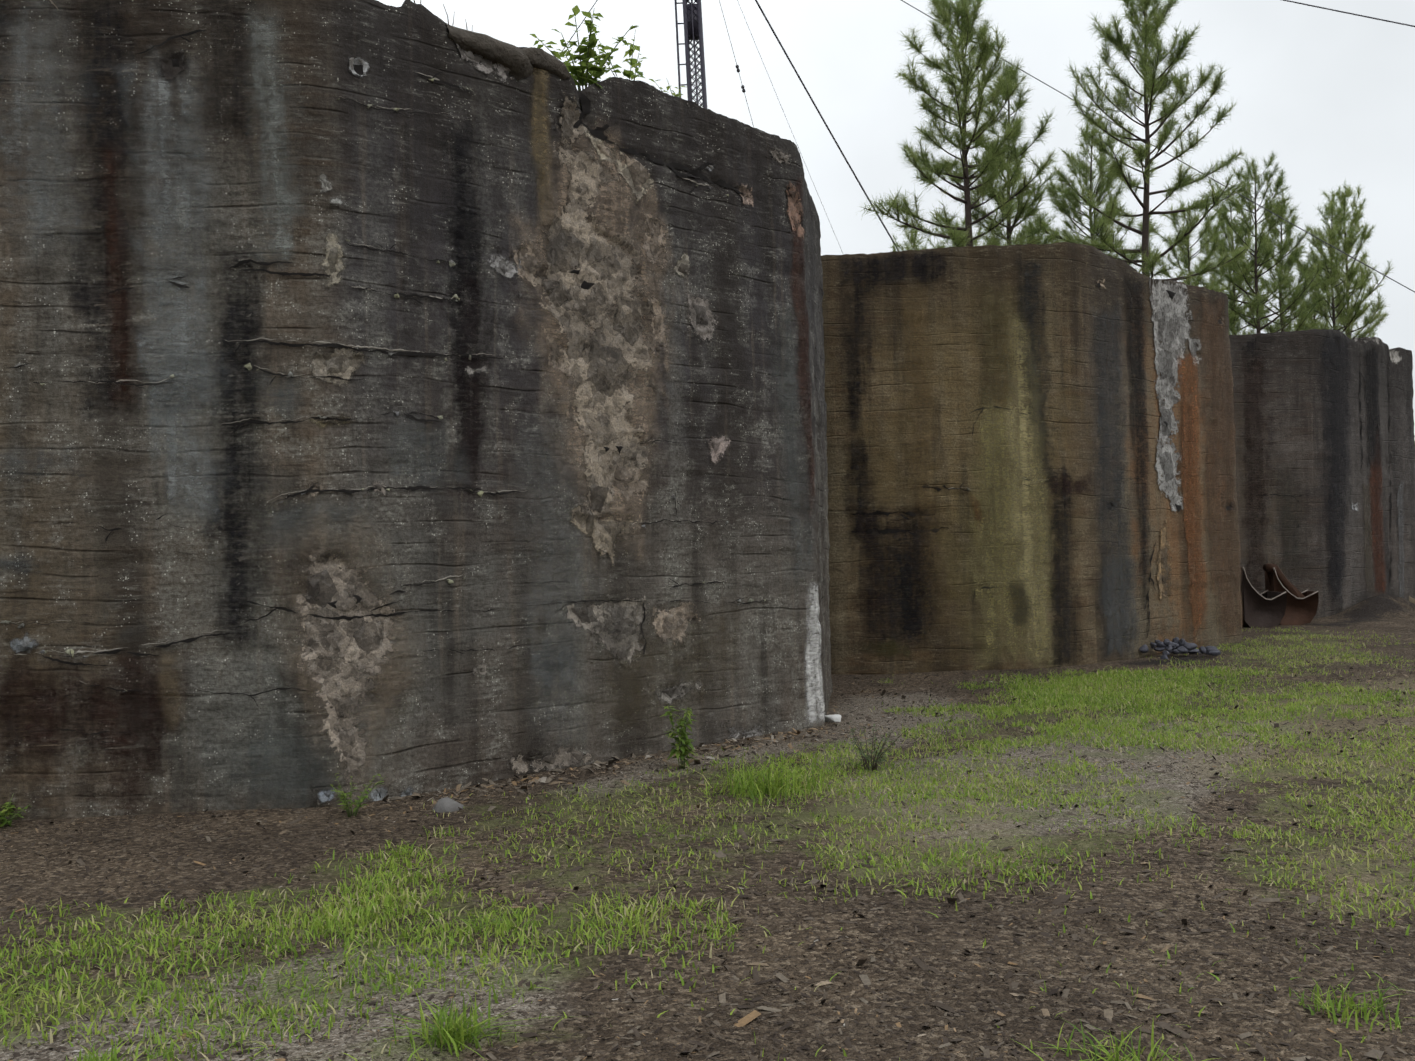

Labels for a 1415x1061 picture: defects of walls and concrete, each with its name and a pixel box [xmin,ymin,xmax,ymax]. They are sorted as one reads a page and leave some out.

leakage [205,7,296,255]
leakage [72,2,261,647]
crack [223,410,450,433]
crack [225,338,503,385]
spalling [487,92,690,564]
spalling [686,294,718,341]
leakage [842,252,947,463]
leakage [974,263,1078,667]
spalling [1149,277,1202,600]
crack [0,574,493,742]
spalling [295,549,414,804]
spalling [566,596,701,666]